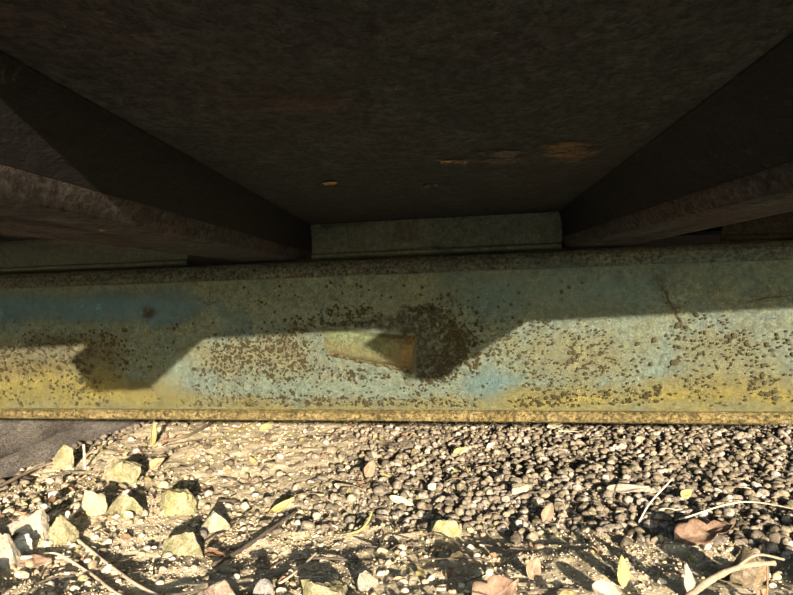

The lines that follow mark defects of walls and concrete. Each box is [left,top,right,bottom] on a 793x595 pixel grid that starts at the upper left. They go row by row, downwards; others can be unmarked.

corrosion [192,317,326,381]
corrosion [327,290,502,408]
corrosion [265,390,391,407]